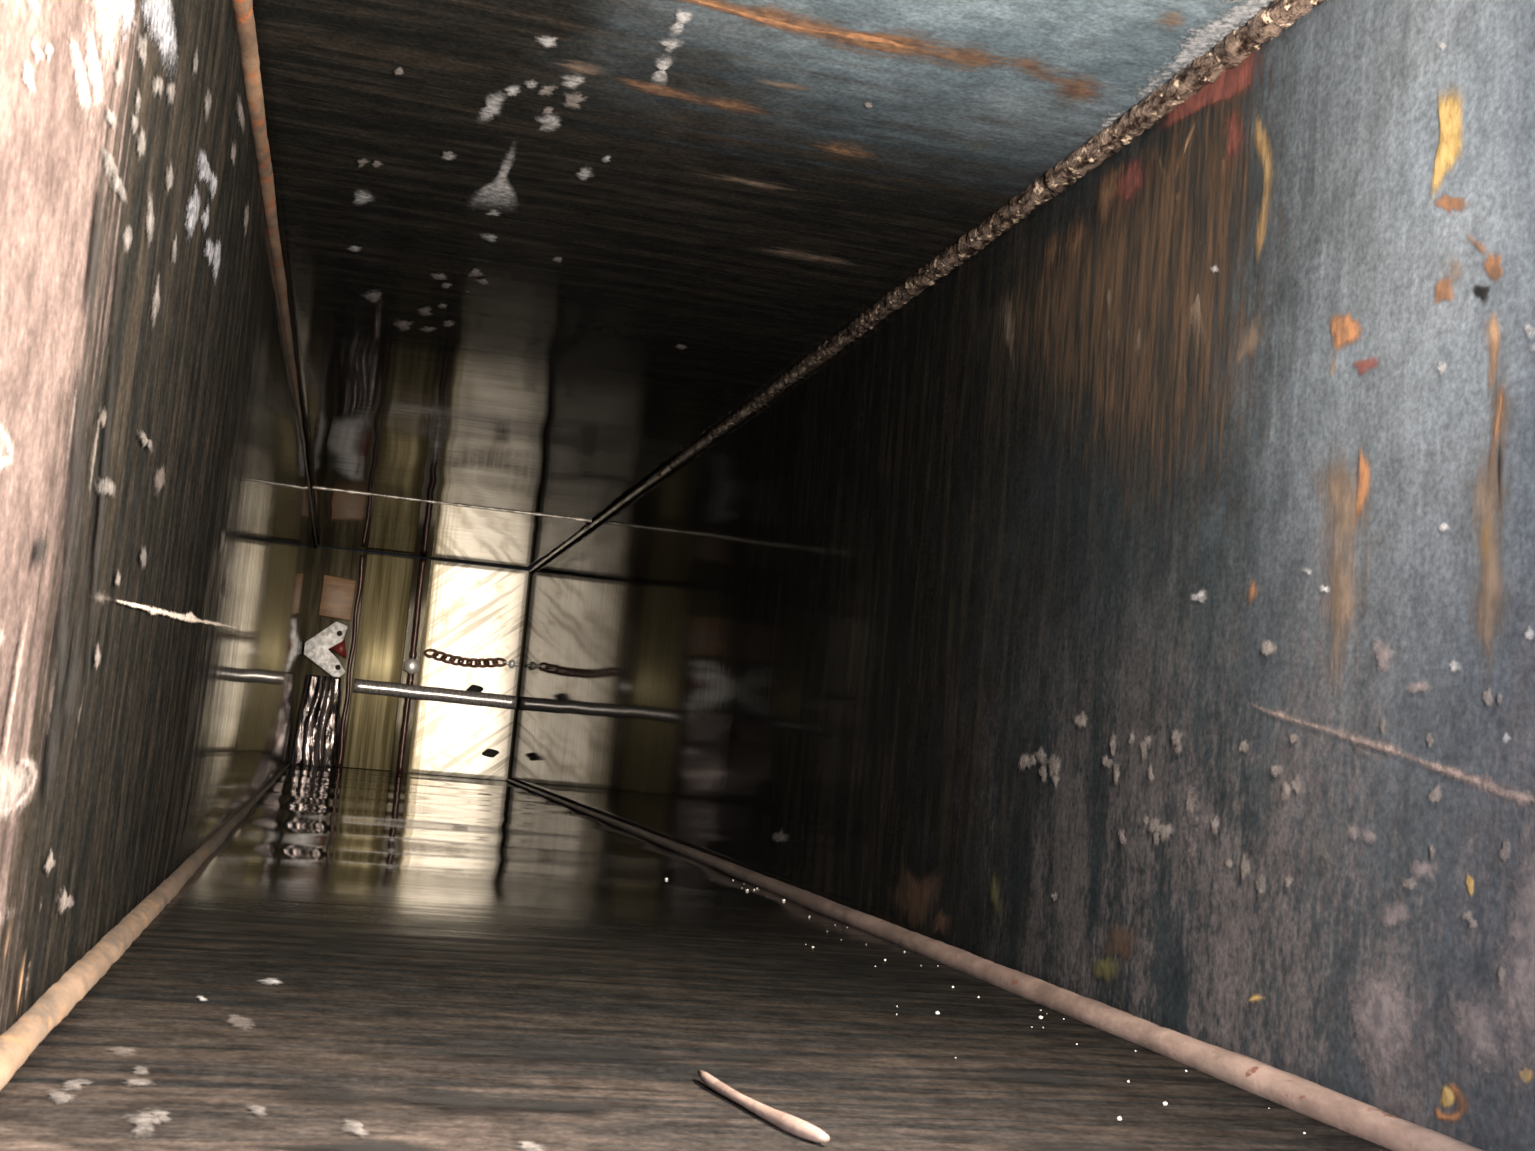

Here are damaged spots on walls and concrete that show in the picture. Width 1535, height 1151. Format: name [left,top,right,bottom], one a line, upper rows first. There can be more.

rust [679,0,1098,100]
rust [1432,94,1465,211]
rust [1331,314,1361,348]
rust [1356,359,1376,373]
rust [1435,265,1459,302]
rust [1469,236,1505,643]
water stain [0,268,123,814]
rust [1327,451,1370,653]